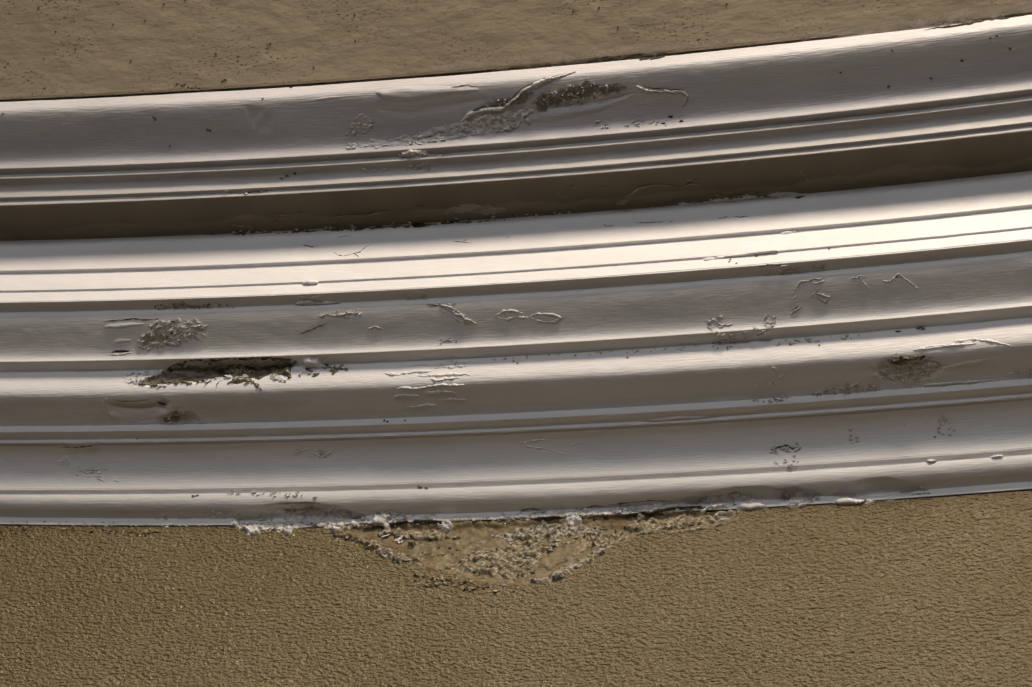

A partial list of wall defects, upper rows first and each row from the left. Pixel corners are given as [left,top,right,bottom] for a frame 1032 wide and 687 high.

peeling [341,71,638,149]
crack [792,277,830,302]
crack [426,302,562,324]
spalling [124,357,348,390]
peeling [811,382,880,396]
spalling [228,489,752,593]